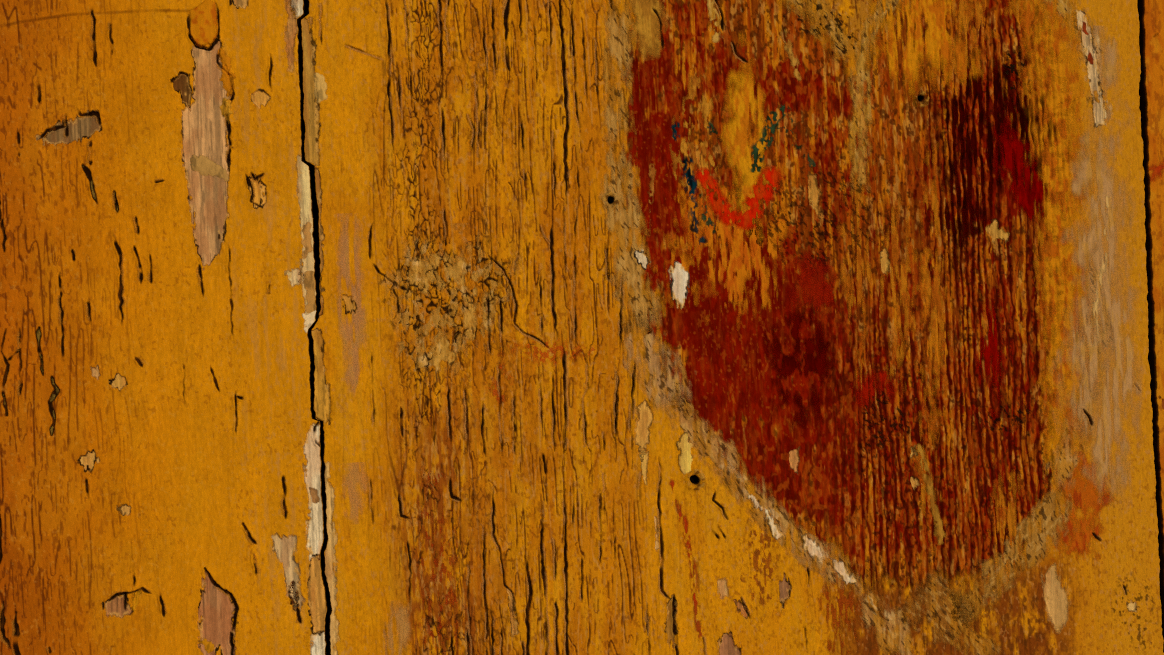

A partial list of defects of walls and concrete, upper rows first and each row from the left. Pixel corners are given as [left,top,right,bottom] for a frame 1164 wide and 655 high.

crack [1,249,91,436]
peeling [36,110,102,146]
crack [17,87,152,322]
peeling [170,40,236,270]
spalling [272,0,340,655]
crack [351,0,449,145]
crack [368,0,636,474]
peeling [1060,10,1141,488]
crack [108,576,165,616]
peeling [197,568,236,655]
crack [450,497,615,655]
peeling [1043,565,1068,632]